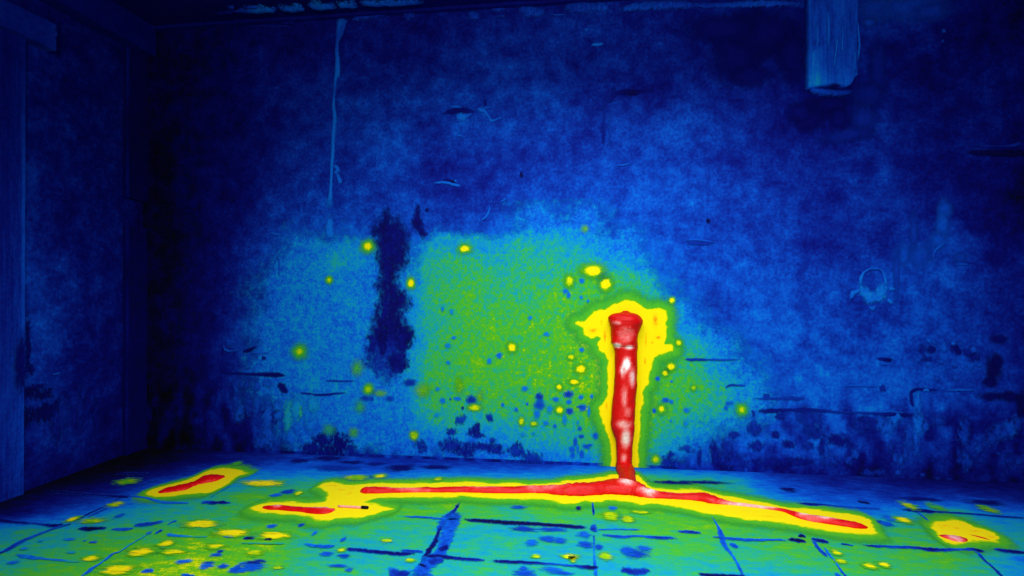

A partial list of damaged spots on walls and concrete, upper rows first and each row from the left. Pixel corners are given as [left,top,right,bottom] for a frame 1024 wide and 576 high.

water stain [240,199,896,544]
water stain [320,552,353,572]
crack [0,472,1024,576]
water stain [513,526,603,549]